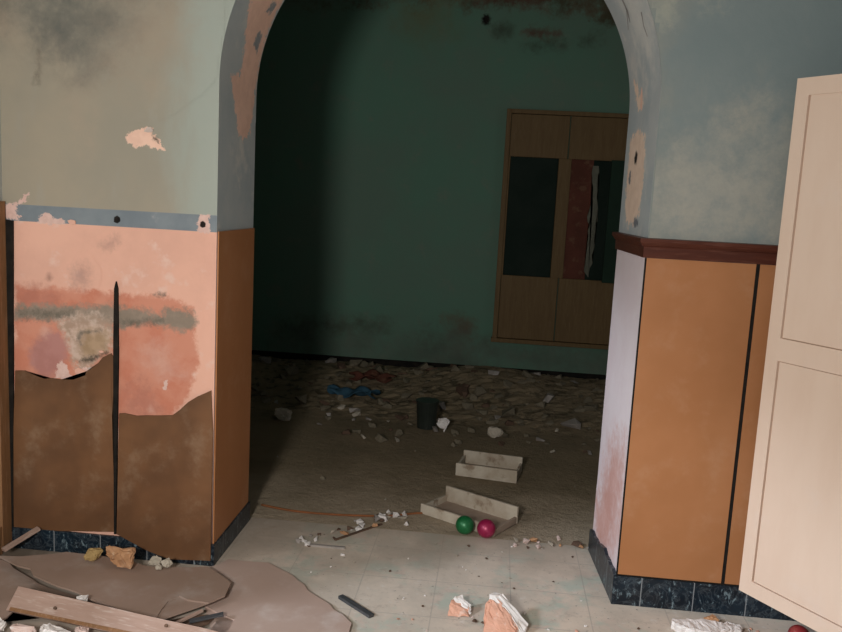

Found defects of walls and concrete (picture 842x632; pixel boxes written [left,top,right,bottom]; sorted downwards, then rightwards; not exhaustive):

damp [277,0,376,21]
damp [474,0,619,34]
peeling [53,0,284,159]
peeling [604,0,842,245]
peeling [2,186,76,230]
peeling [192,209,216,238]
damp [14,269,76,298]
damp [14,328,31,392]
damp [95,277,212,438]